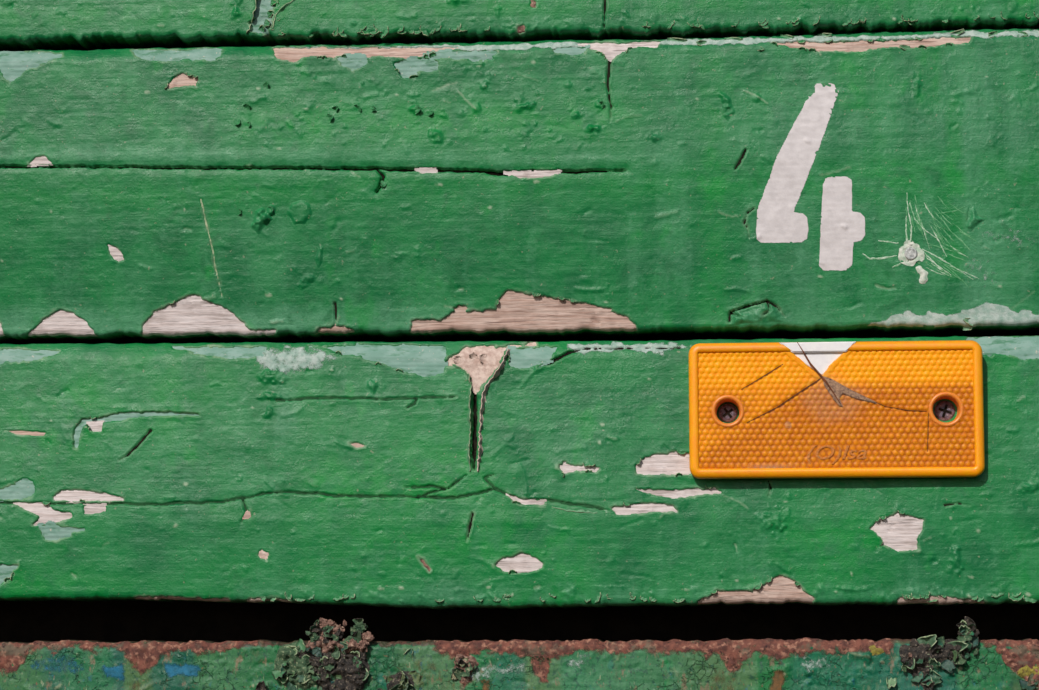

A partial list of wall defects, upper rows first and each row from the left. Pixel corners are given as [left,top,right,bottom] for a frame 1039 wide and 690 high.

peeling [246,0,1039,79]
crack [605,61,613,108]
peeling [868,302,1039,360]
peeling [142,290,686,471]
crack [0,393,506,538]
peeling [0,478,124,540]
crack [535,499,604,510]
peeling [870,510,924,552]
peeling [698,576,814,604]
rust [0,640,258,675]
rust [255,617,421,690]
rust [416,616,1039,690]